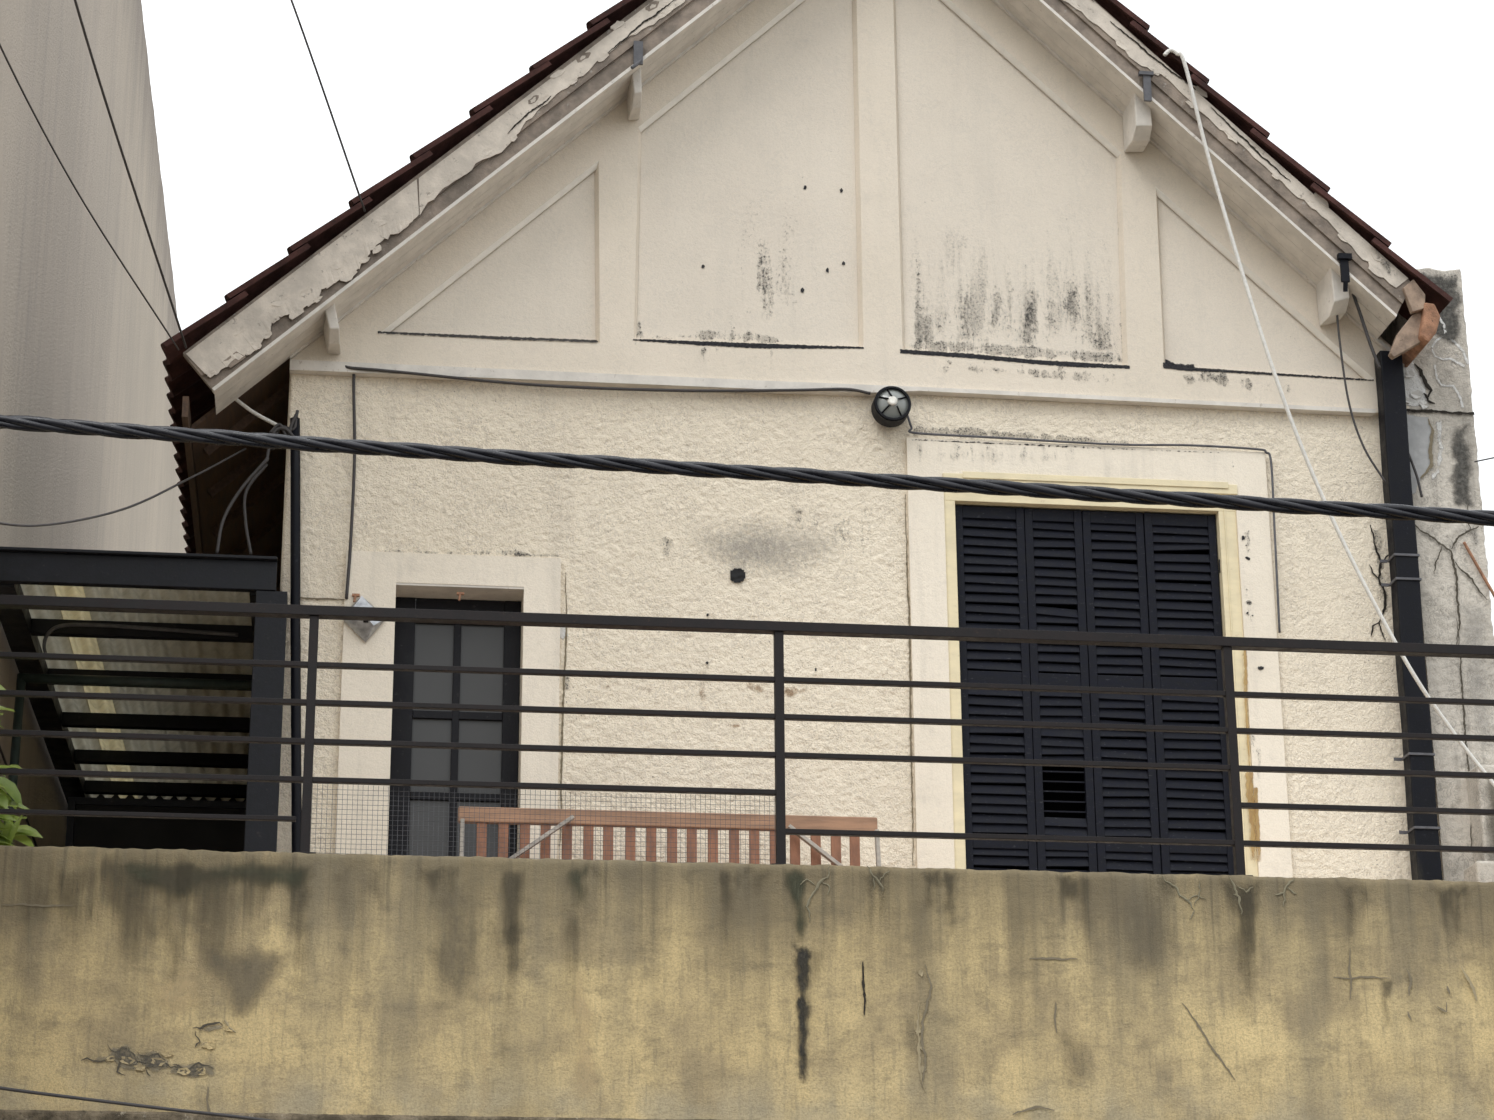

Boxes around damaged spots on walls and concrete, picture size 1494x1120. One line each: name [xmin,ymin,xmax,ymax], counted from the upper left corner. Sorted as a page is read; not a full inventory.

peeling [1063,0,1408,288]
peeling [186,0,685,378]
water stain [900,261,1130,378]
crack [1407,408,1475,416]
water stain [107,865,304,909]
water stain [505,875,520,942]
water stain [1236,889,1254,938]
water stain [211,955,273,1011]
water stain [787,871,809,1078]
spalling [82,1020,236,1077]